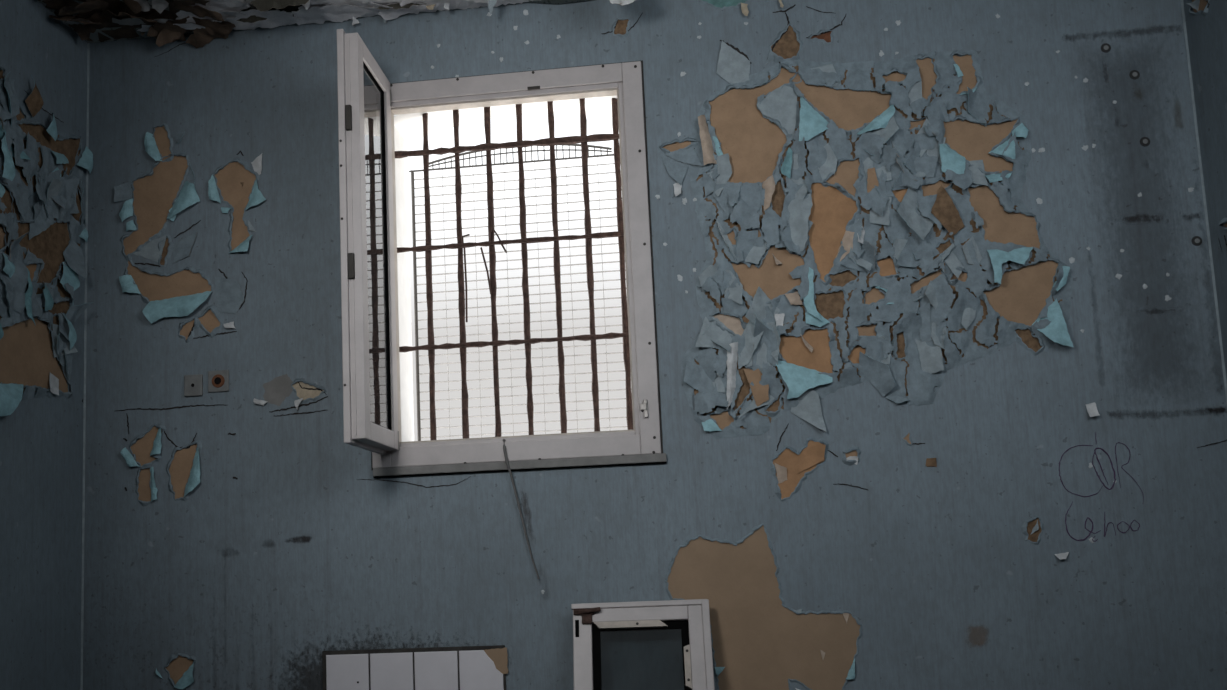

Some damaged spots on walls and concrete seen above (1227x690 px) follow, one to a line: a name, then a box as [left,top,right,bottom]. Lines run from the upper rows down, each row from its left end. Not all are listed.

peeling [38,0,534,48]
peeling [0,65,94,416]
peeling [114,123,266,343]
peeling [657,0,1074,501]
peeling [120,423,202,507]
peeling [253,374,328,416]
peeling [156,653,198,689]
flaking render [664,524,863,690]